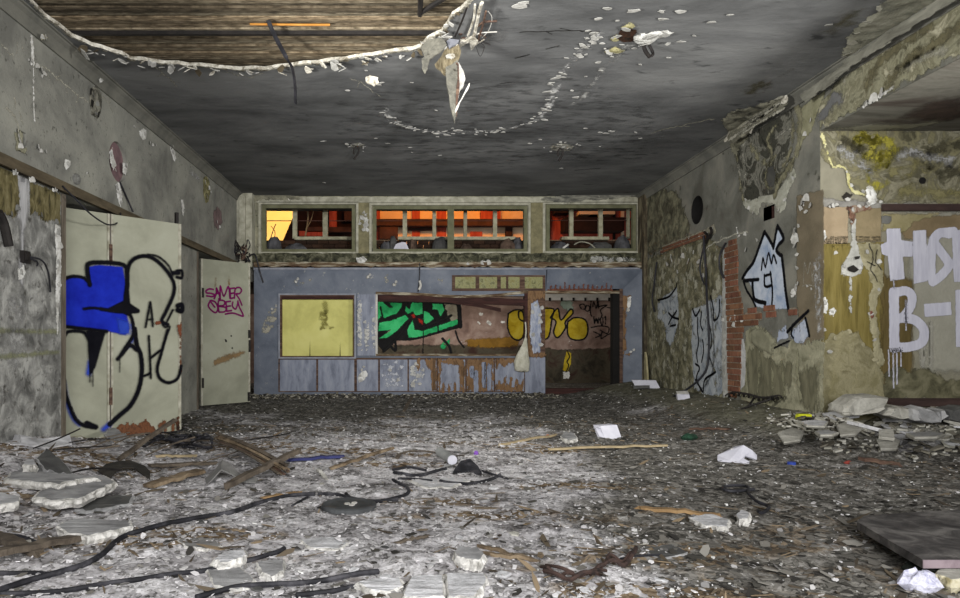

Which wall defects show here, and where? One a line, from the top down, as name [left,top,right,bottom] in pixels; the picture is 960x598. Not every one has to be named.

spalling [30,0,473,77]
spalling [379,7,696,137]
water stain [818,5,960,233]
flaking render [590,0,955,414]
peeling [54,219,63,335]
rust [116,417,180,435]